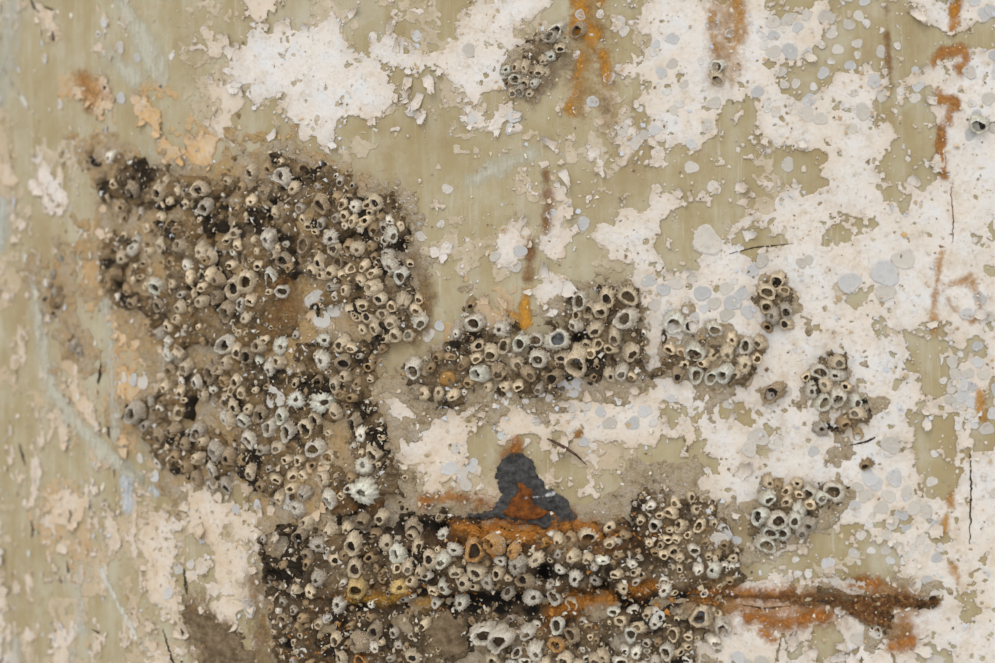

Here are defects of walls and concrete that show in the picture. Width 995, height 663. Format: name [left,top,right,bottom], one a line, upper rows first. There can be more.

peeling [57,70,116,143]
peeling [130,0,552,170]
corrosion [564,0,611,116]
corrosion [709,0,745,75]
corrosion [935,89,961,179]
corrosion [931,0,970,75]
peeling [0,107,89,312]
peeling [396,0,995,663]
peeling [369,382,416,421]
peeling [0,309,283,663]
corrosion [419,436,601,543]
corrosion [692,577,941,651]